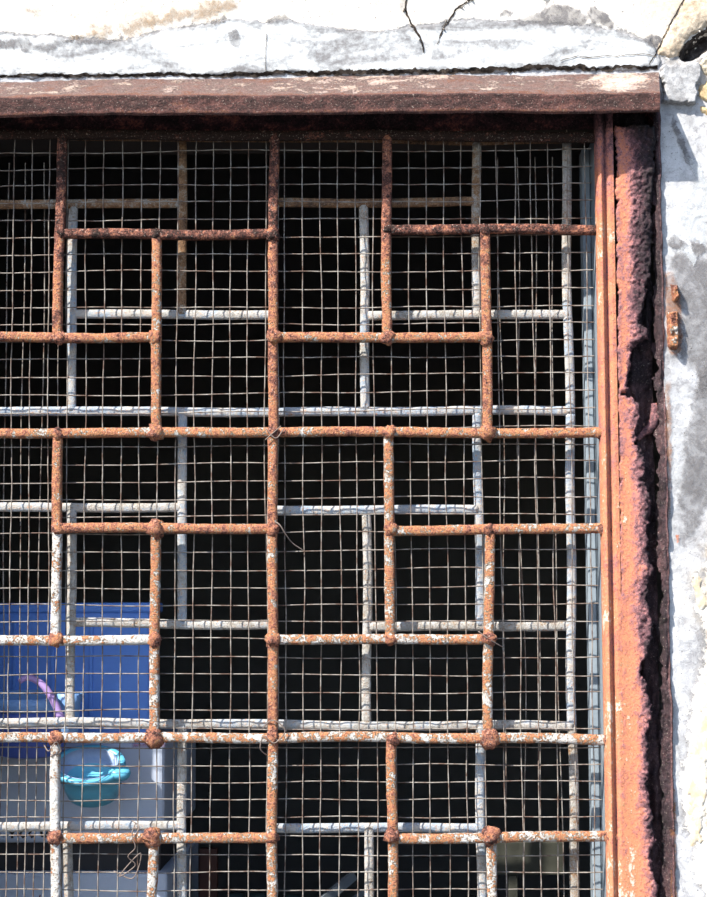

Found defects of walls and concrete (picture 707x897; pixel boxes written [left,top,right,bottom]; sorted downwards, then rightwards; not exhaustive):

damp [0,1,236,52]
crack [0,0,707,78]
spalling [680,36,707,115]
rust [613,113,648,346]
rust [665,287,682,354]
damp [668,120,707,532]
rust [617,260,677,897]
flaking render [684,651,707,847]